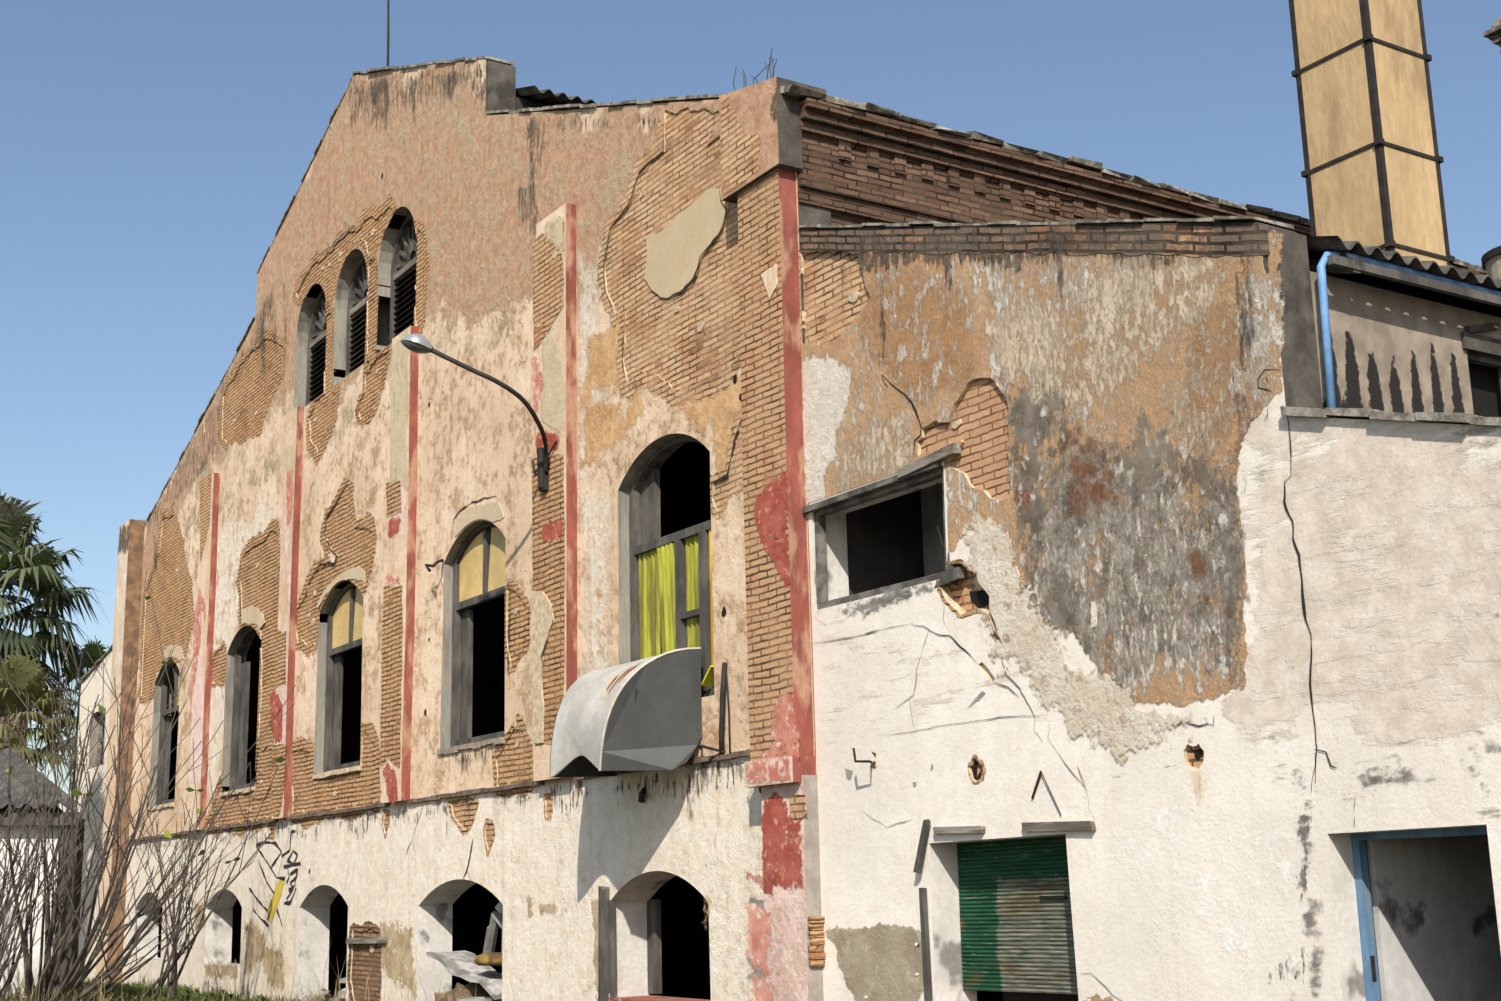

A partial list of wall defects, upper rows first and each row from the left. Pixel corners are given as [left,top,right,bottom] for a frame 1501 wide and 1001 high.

spalling [138,474,227,716]
spalling [219,329,287,450]
spalling [205,467,403,841]
spalling [597,94,760,407]
crack [814,598,1094,817]
peeling [710,229,1285,707]
crack [1257,369,1336,792]
peeling [808,916,924,1001]